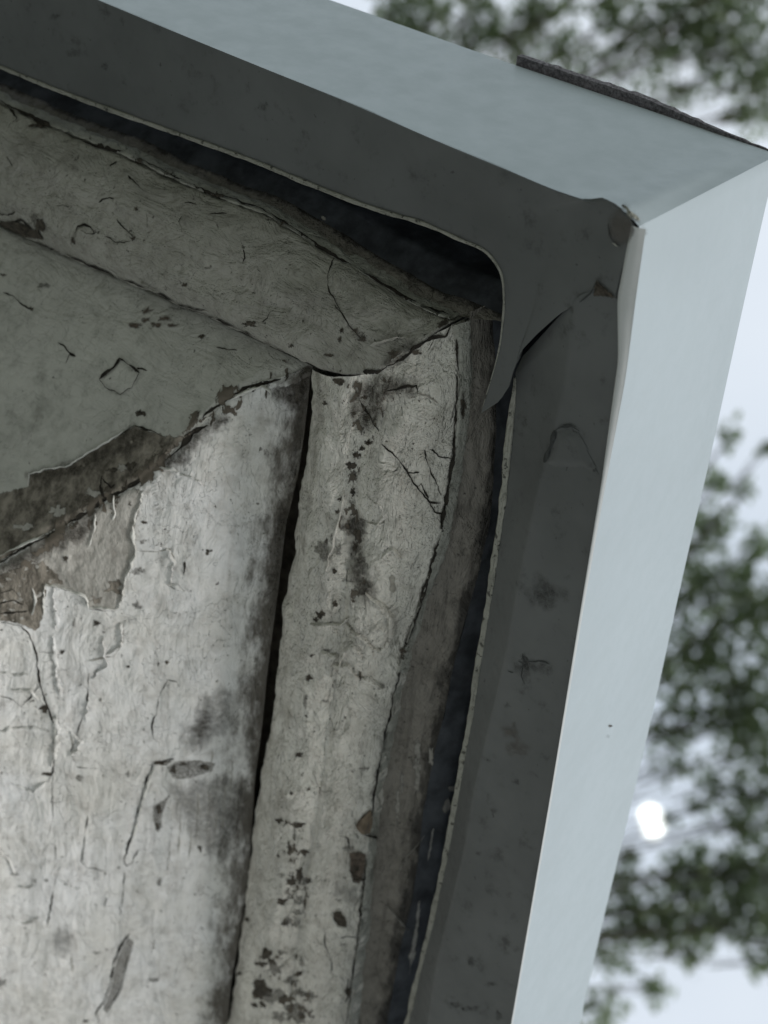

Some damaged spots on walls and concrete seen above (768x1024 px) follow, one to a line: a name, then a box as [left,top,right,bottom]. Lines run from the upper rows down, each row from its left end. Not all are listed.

peeling [0,409,205,700]
peeling [129,308,177,328]
crack [0,100,467,817]
crack [324,860,367,1024]